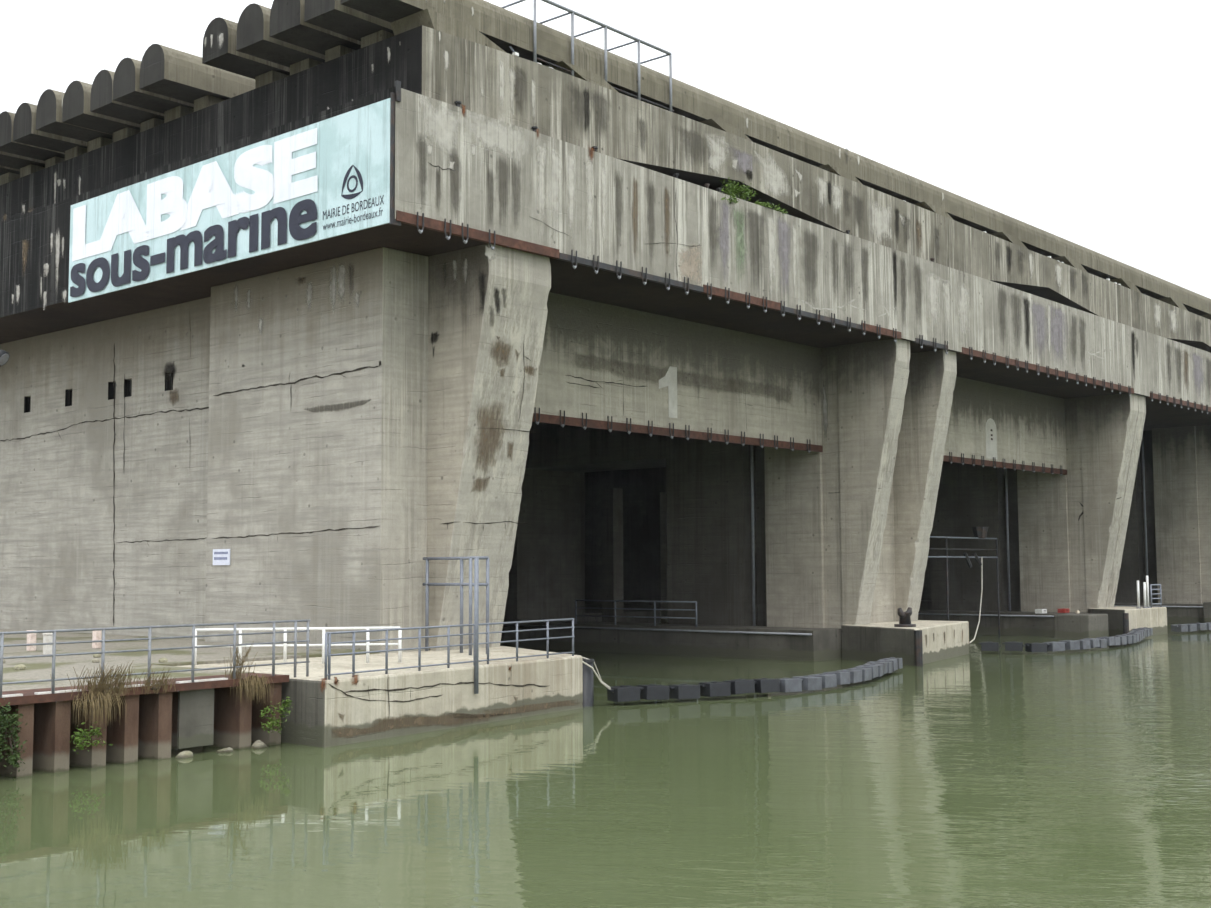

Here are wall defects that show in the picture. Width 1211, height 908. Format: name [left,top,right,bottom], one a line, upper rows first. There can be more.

damp [419,138,459,210]
damp [488,158,519,215]
damp [540,147,669,253]
damp [819,178,862,220]
damp [444,259,506,325]
damp [711,199,817,290]
damp [833,240,868,300]
damp [893,252,967,326]
damp [996,244,1033,274]
damp [1000,290,1085,359]
damp [1167,344,1211,391]
crack [0,345,378,625]